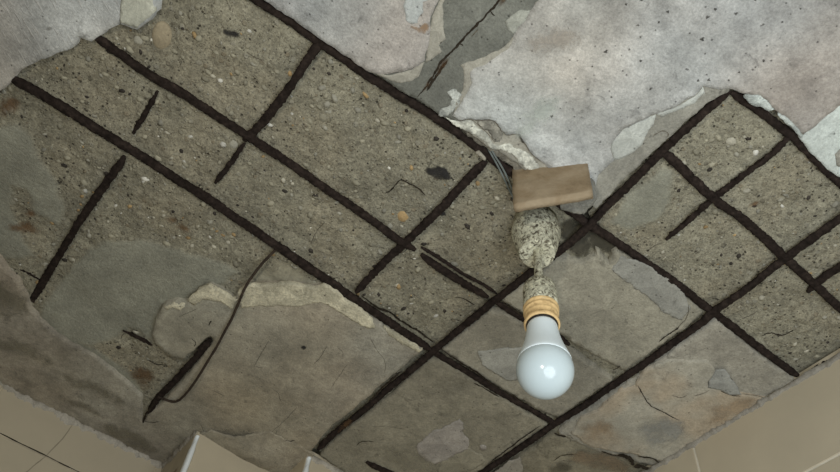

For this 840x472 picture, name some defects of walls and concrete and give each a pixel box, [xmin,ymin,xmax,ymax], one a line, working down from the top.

crack [418,0,500,96]
crack [0,426,79,472]
crack [142,399,156,423]
spalling [0,82,375,417]
spalling [17,0,547,347]
spalling [314,157,794,472]
spalling [583,86,840,301]
spalling [720,264,840,373]